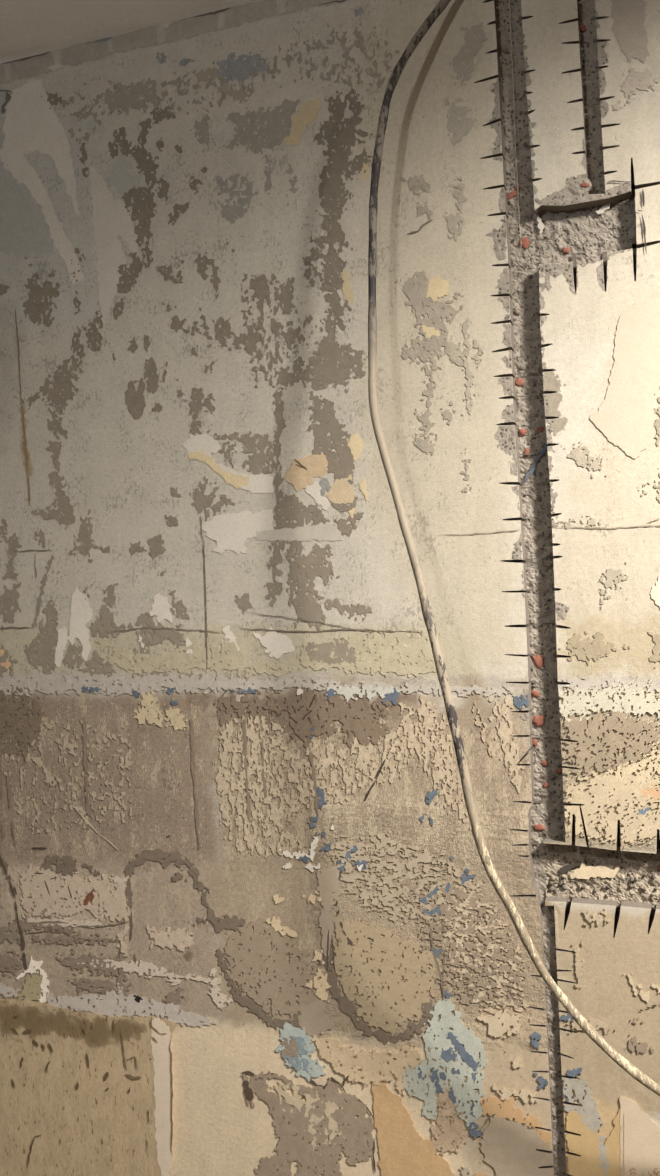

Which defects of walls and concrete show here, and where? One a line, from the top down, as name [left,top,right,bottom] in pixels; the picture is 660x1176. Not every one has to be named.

flaking render [444,21,502,162]
spalling [523,34,631,234]
flaking render [596,0,659,118]
flaking render [399,175,467,241]
flaking render [17,7,400,631]
flaking render [396,270,484,460]
spalling [486,188,520,510]
flaking render [461,448,472,492]
flaking render [0,519,22,631]
spalling [555,602,570,621]
flaking render [0,555,553,1176]
peeling [562,1067,609,1175]